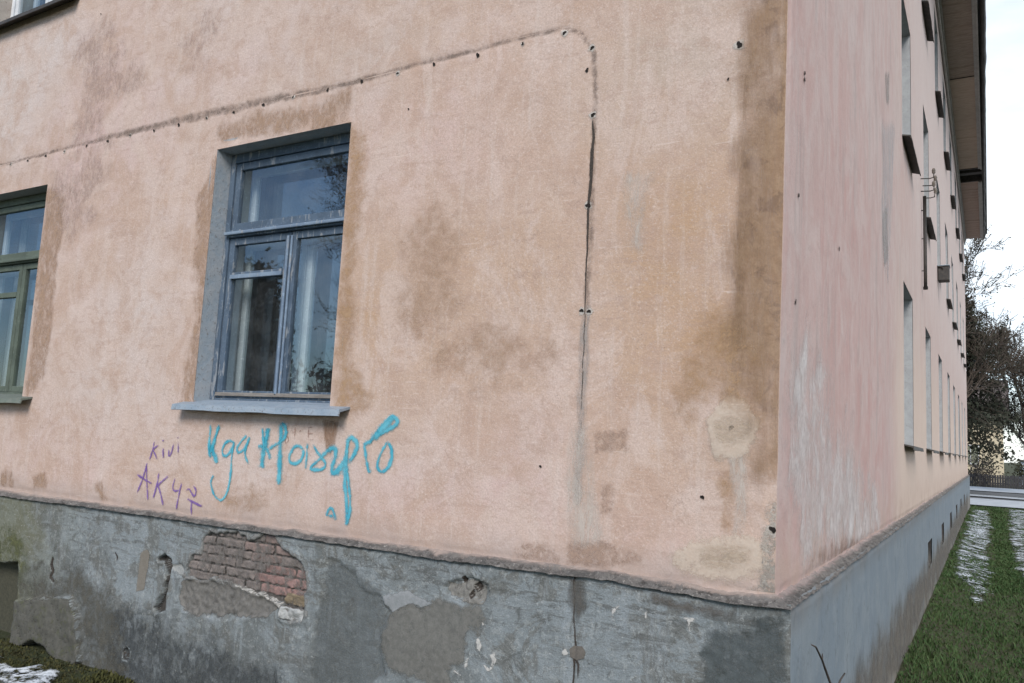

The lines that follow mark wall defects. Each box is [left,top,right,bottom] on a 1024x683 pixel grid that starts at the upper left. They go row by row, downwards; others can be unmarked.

damp [686,0,788,416]
flaking render [158,529,309,624]
flaking render [448,576,487,605]
peeling [476,638,496,671]
crack [570,577,585,683]